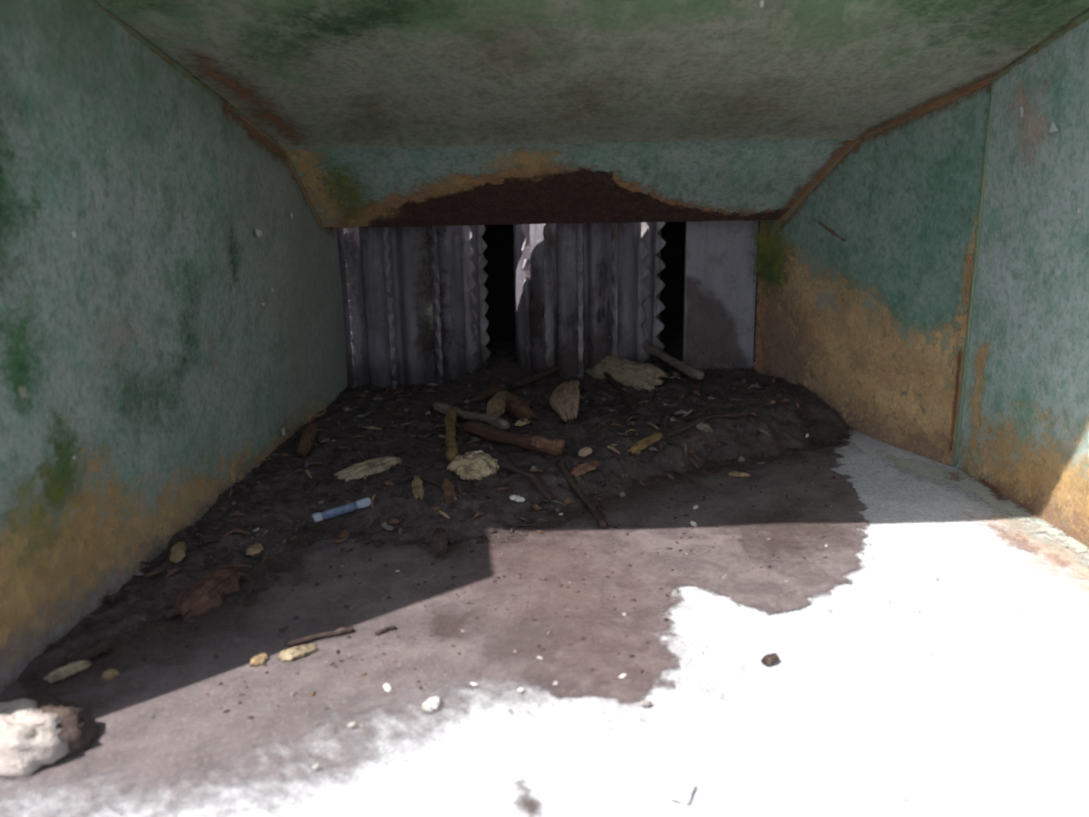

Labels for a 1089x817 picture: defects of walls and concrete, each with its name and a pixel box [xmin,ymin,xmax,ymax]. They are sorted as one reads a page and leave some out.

corrosion [774,73,999,224]
corrosion [0,404,324,695]
water stain [0,437,870,817]
corrosion [942,216,1089,589]